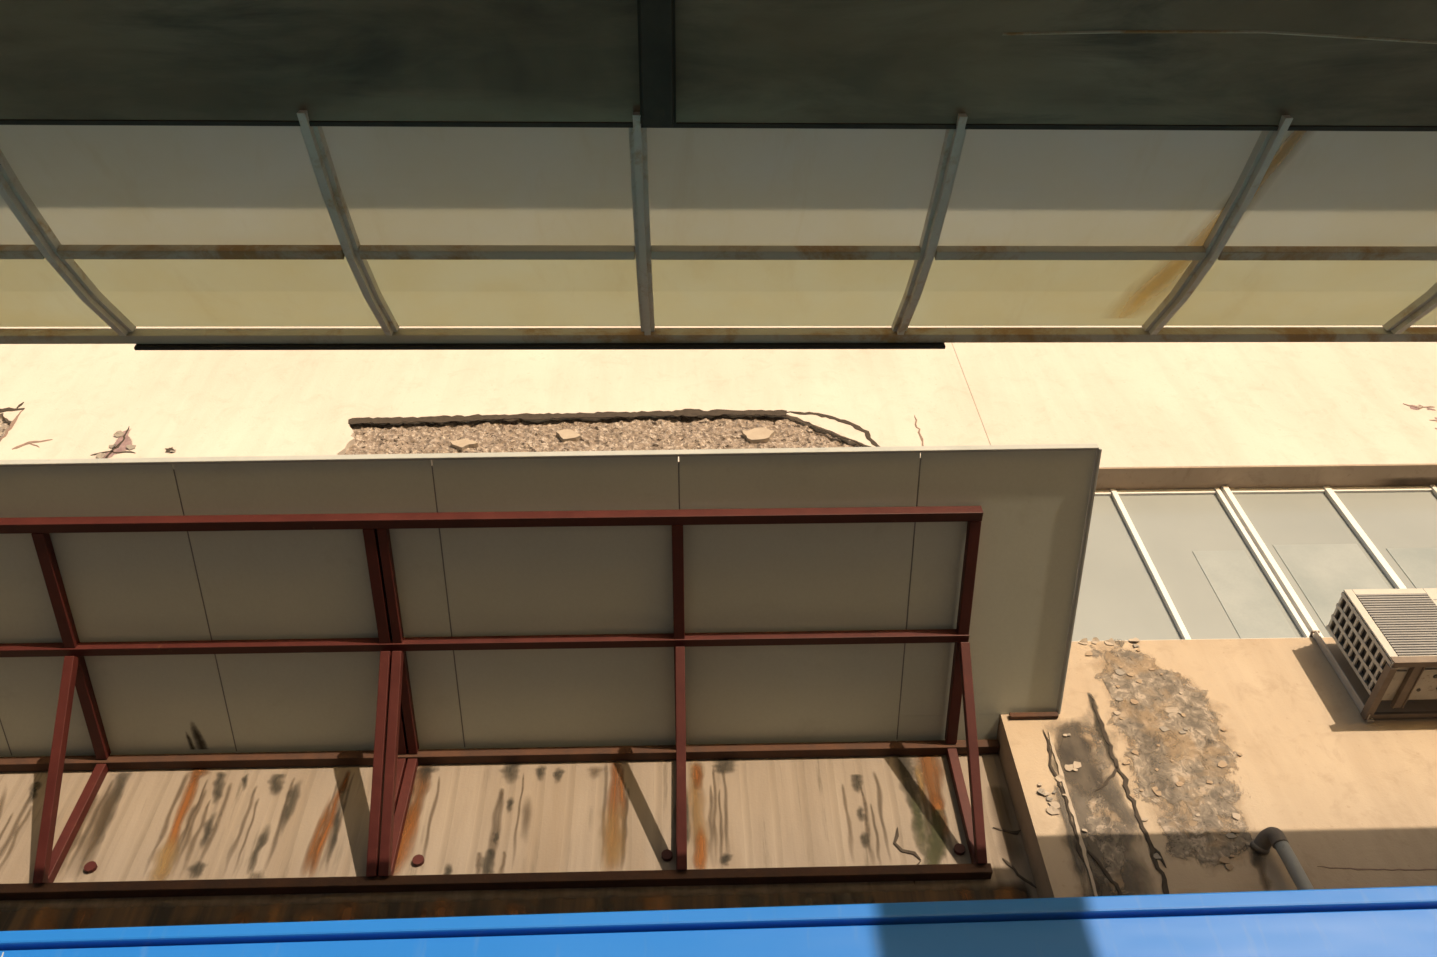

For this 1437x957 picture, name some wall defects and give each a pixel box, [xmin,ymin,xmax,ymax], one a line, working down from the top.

rust [1255,131,1306,194]
rust [1124,209,1224,315]
spalling [0,418,10,442]
spalling [343,409,880,462]
rust [155,768,206,877]
rust [306,772,352,865]
rust [395,765,439,868]
rust [604,762,628,858]
rust [675,765,722,869]
rust [918,755,947,834]
peeling [1078,637,1253,870]
rust [0,884,1030,931]